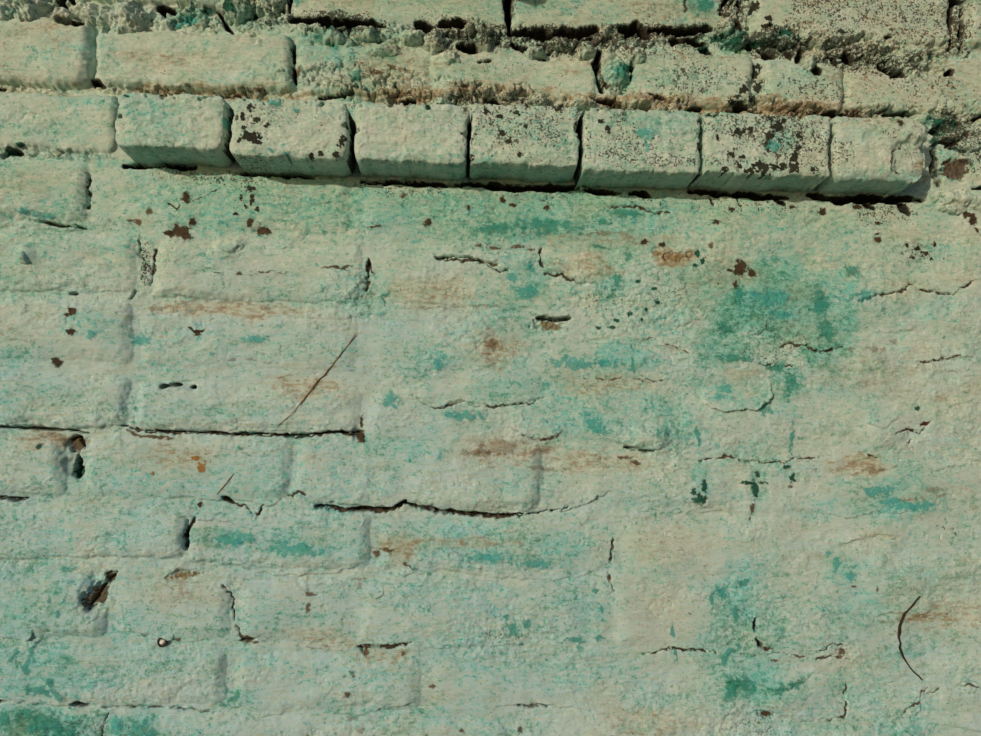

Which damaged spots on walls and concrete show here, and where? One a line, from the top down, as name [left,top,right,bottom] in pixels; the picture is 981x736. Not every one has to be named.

peeling [236,103,270,145]
peeling [715,115,819,186]
spalling [939,158,969,182]
crack [440,258,507,273]
damp [727,259,793,320]
damp [851,290,876,302]
crack [861,280,972,302]
damp [808,290,836,345]
damp [765,359,798,402]
crack [222,496,264,516]
crack [291,490,567,519]
spalling [81,570,117,610]